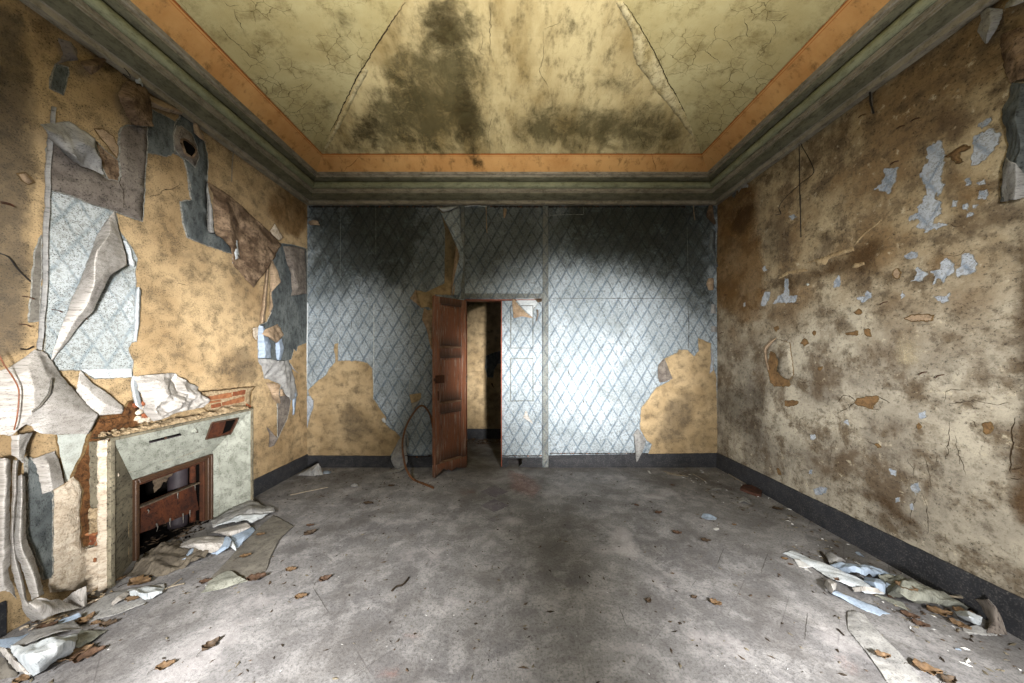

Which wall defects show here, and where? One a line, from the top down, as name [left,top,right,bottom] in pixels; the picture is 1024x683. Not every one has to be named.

spalling [173,125,199,168]
crack [331,3,405,130]
damp [358,2,486,165]
damp [524,107,678,148]
crack [626,5,710,127]
flaking render [944,144,971,164]
flaking render [270,223,284,241]
peeling [307,343,401,456]
peeling [639,338,717,454]
peeling [763,326,816,387]
flaking render [48,400,152,592]
damp [1010,430,1024,523]